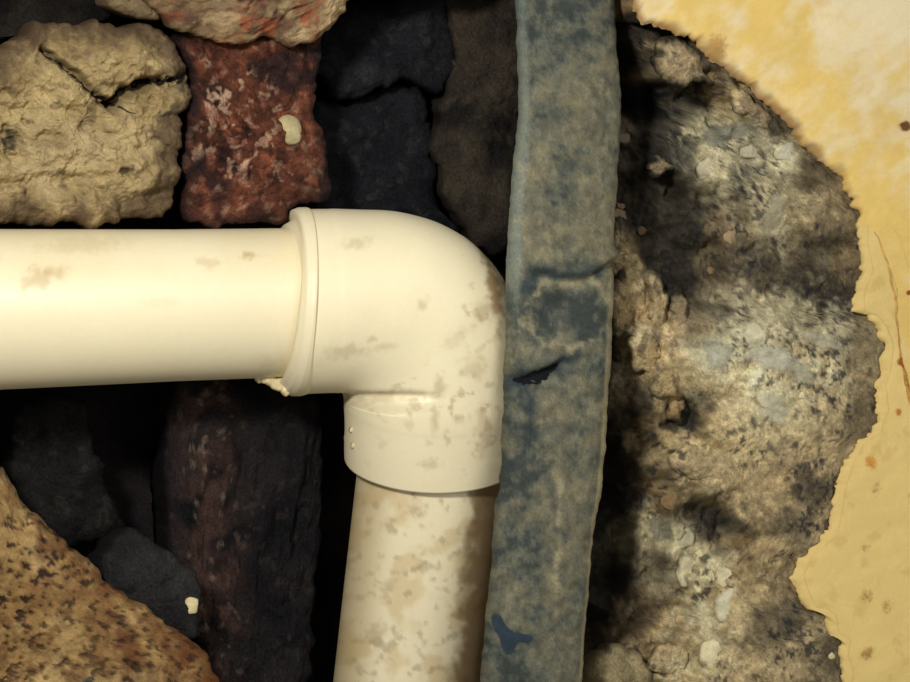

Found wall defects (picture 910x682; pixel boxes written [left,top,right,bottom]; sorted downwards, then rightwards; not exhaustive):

crack [45,56,186,114]
spalling [279,115,301,145]
flaking render [583,0,910,682]
crack [874,231,910,404]